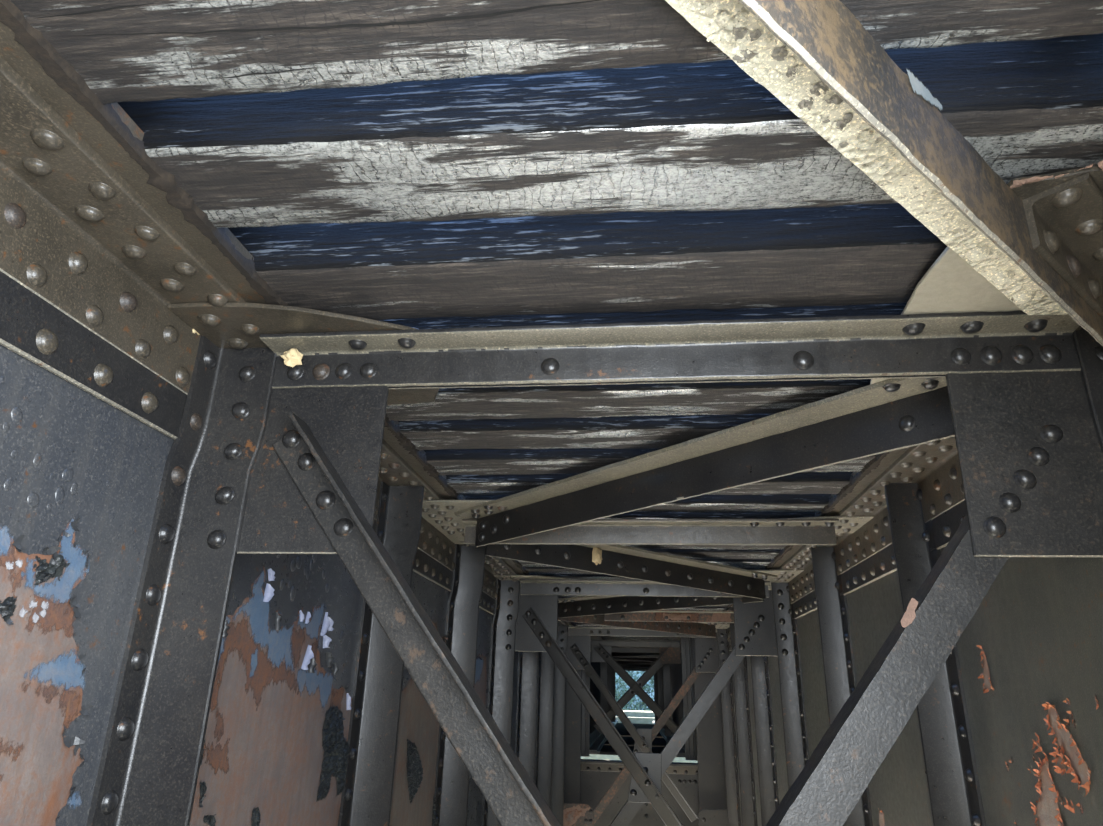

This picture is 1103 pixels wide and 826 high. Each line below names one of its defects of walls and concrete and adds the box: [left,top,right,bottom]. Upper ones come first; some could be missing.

peeling [0,518,93,826]
peeling [189,566,352,826]
peeling [976,645,995,693]
peeling [1030,702,1091,826]